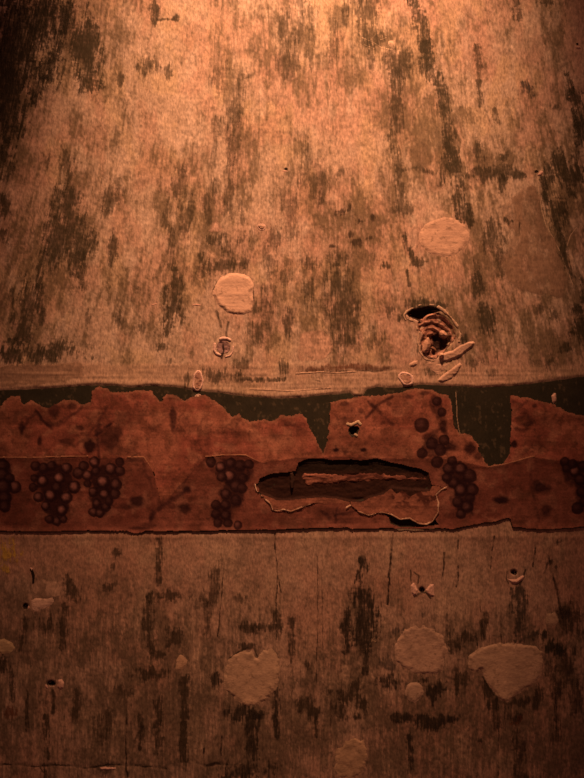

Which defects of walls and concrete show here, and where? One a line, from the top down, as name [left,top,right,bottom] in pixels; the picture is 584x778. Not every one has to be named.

damp [0,0,105,181]
damp [149,0,179,27]
damp [346,0,527,228]
damp [539,71,584,275]
peeling [0,385,93,408]
damp [0,183,97,364]
damp [156,264,186,350]
peeling [105,386,332,453]
damp [403,234,425,287]
peeling [367,297,584,466]
damp [329,556,397,720]
flaking render [410,570,435,598]